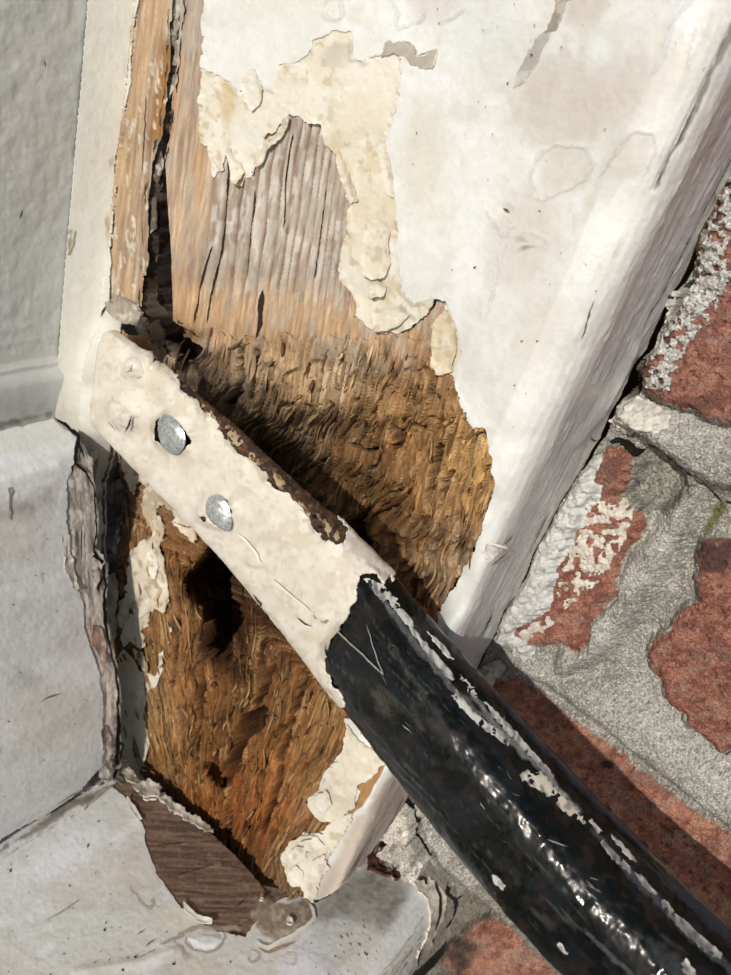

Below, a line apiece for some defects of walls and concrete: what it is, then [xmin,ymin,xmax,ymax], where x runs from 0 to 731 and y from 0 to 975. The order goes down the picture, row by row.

crack [138,0,212,368]
peeling [107,0,461,379]
crack [645,160,731,324]
crack [656,27,731,186]
peeling [61,529,80,590]
crack [54,417,162,805]
peeling [90,450,266,927]
peeling [281,725,385,903]